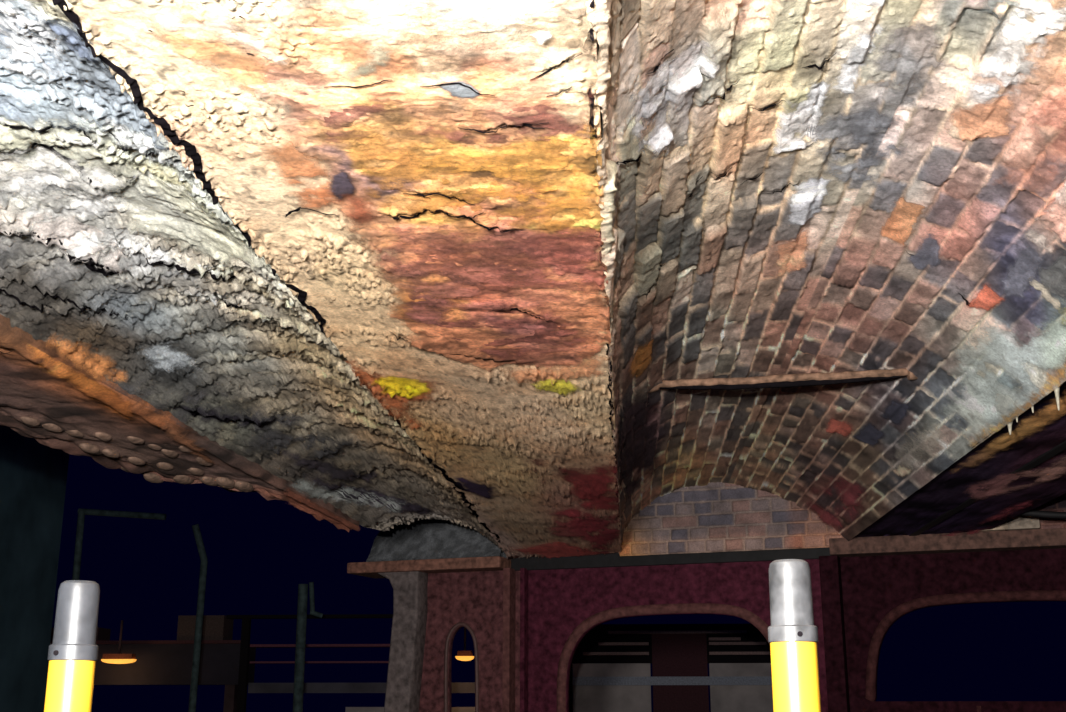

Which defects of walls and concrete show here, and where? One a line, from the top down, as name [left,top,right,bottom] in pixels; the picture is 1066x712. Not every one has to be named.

crack [0,0,501,543]
corrosion [269,143,336,208]
spalling [148,0,611,370]
crack [373,193,524,233]
crack [458,122,549,133]
crack [530,0,658,180]
damp [633,40,717,155]
damp [774,27,877,153]
damp [949,0,1066,141]
crack [605,296,620,527]